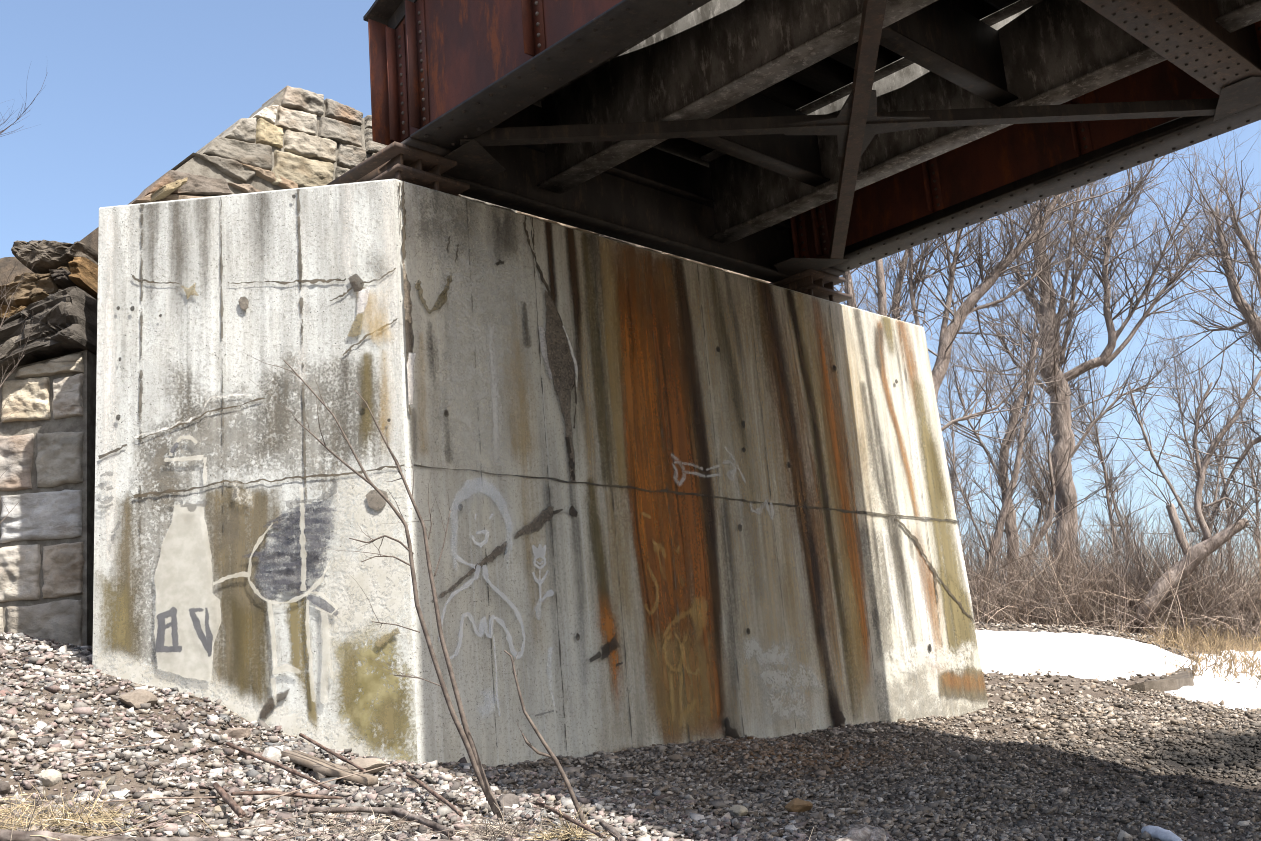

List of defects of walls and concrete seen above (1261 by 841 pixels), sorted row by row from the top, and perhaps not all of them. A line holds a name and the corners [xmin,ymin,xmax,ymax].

water stain [93,272,369,757]
crack [495,216,577,428]
corrosion [579,233,868,743]
water stain [744,281,854,720]
water stain [854,308,988,701]